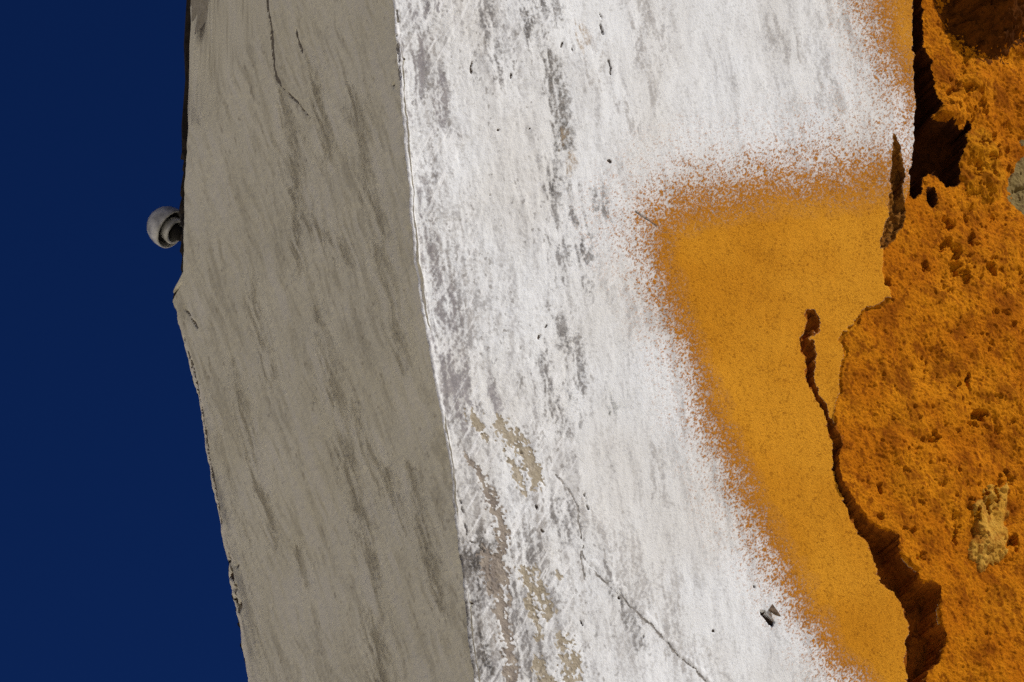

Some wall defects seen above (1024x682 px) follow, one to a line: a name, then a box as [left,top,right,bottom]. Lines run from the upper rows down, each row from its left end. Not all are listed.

spalling [833,0,1024,682]
peeling [464,407,546,510]
peeling [463,451,587,682]
crack [555,474,706,682]
crack [799,297,947,682]